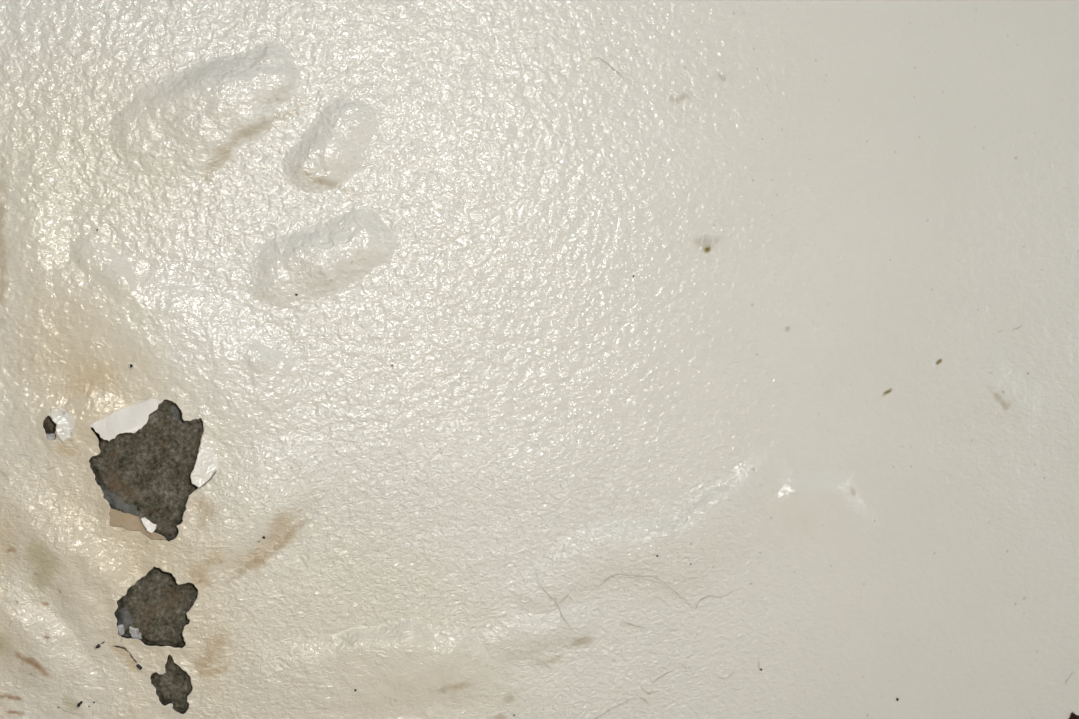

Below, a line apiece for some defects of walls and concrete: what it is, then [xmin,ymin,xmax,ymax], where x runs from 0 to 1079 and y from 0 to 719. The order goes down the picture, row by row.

peeling [35,384,219,719]